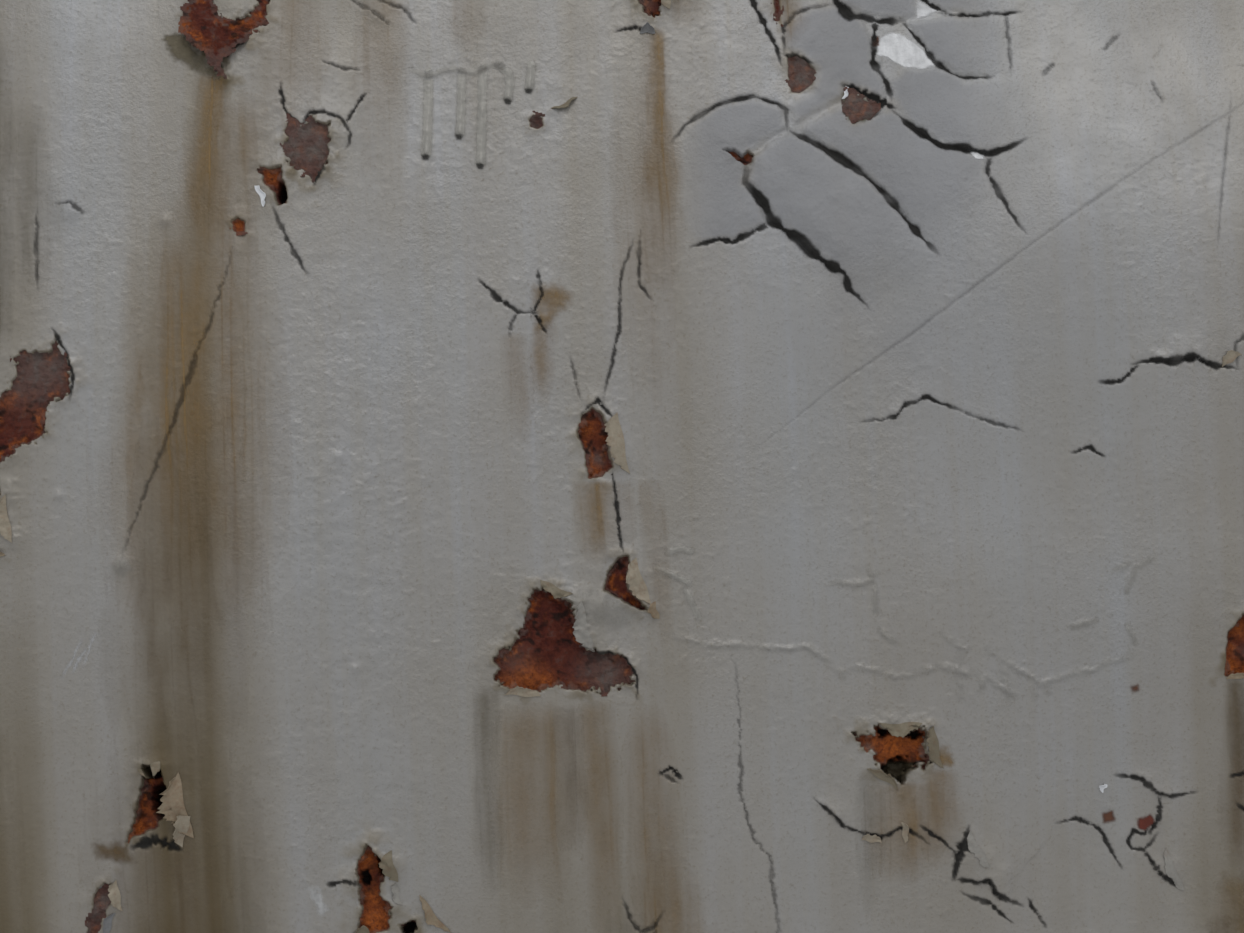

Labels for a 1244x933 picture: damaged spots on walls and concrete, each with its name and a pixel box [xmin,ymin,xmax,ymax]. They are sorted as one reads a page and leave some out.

peeling [771,0,784,27]
peeling [917,3,937,18]
peeling [875,33,934,69]
peeling [785,53,816,93]
peeling [841,86,881,124]
peeling [728,151,753,165]
crack [481,273,566,331]
crack [1102,350,1242,384]
crack [890,395,953,419]
crack [1074,445,1104,456]
crack [1062,774,1188,891]
crack [923,827,1044,923]